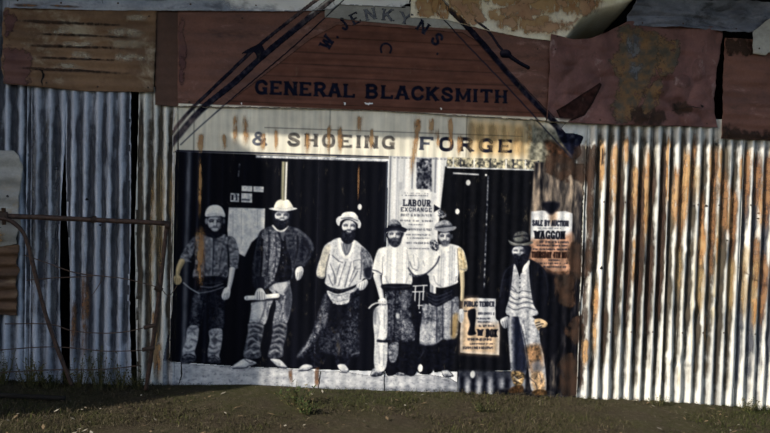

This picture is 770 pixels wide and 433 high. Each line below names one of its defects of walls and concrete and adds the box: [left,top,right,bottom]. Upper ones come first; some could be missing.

rust [1,7,157,92]
rust [415,0,602,34]
rust [223,117,248,148]
rust [327,127,342,150]
rust [411,118,439,168]
rust [448,119,462,153]
rust [698,149,770,271]
rust [0,234,20,316]
rust [543,137,696,396]
rust [752,238,769,324]